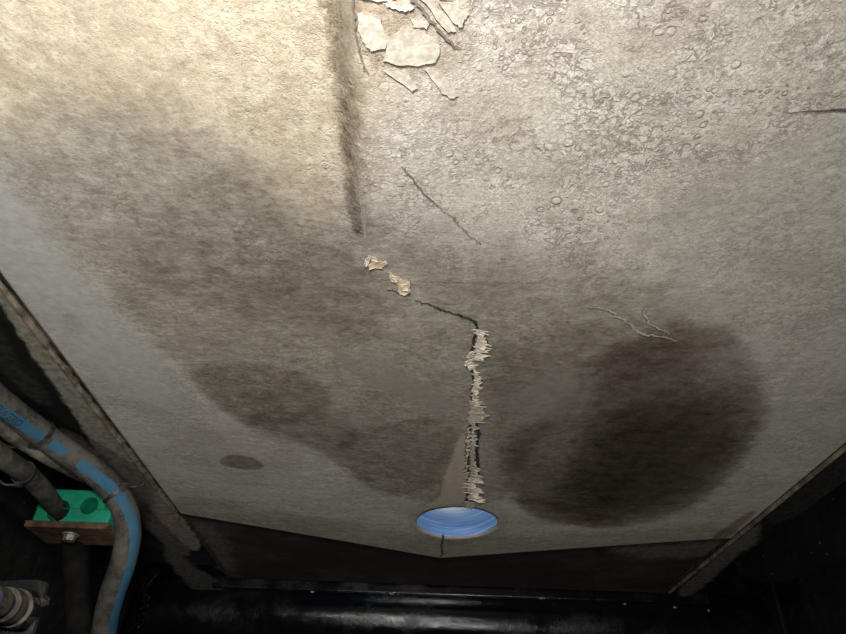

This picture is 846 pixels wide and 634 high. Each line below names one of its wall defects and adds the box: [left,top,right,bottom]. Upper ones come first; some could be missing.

peeling [352,0,468,99]
crack [402,167,480,242]
peeling [364,255,410,296]
crack [581,306,678,341]
damp [0,288,236,590]
crack [386,289,492,511]
damp [614,452,846,596]